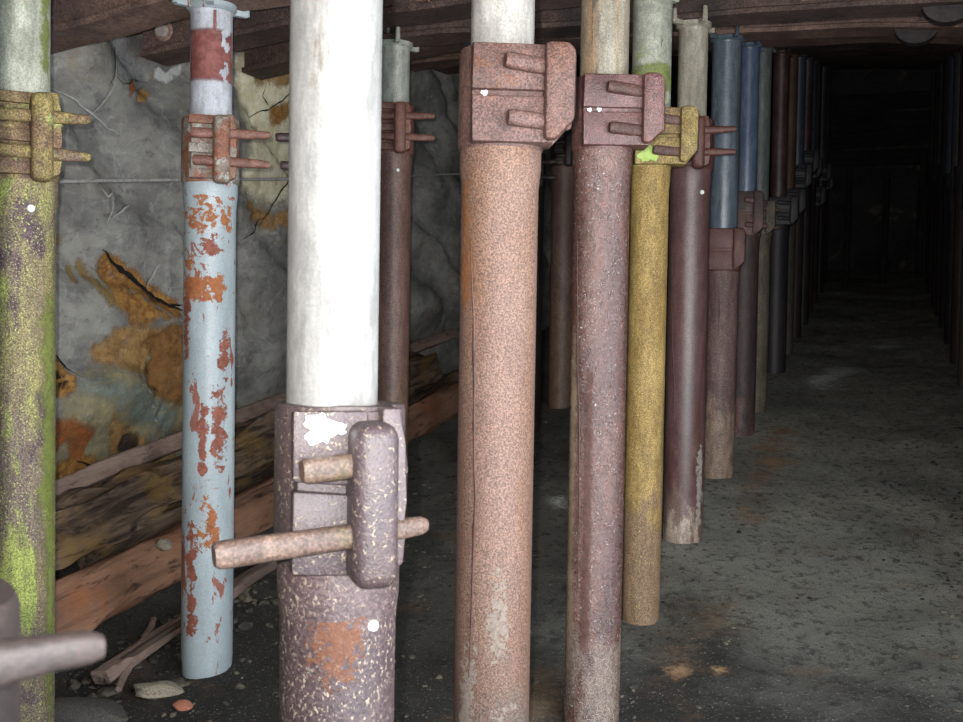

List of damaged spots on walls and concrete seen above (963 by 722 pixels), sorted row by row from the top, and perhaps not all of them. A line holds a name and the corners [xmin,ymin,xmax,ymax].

rust [461,179,472,302]
crack [103,249,183,311]
rust [303,616,371,693]